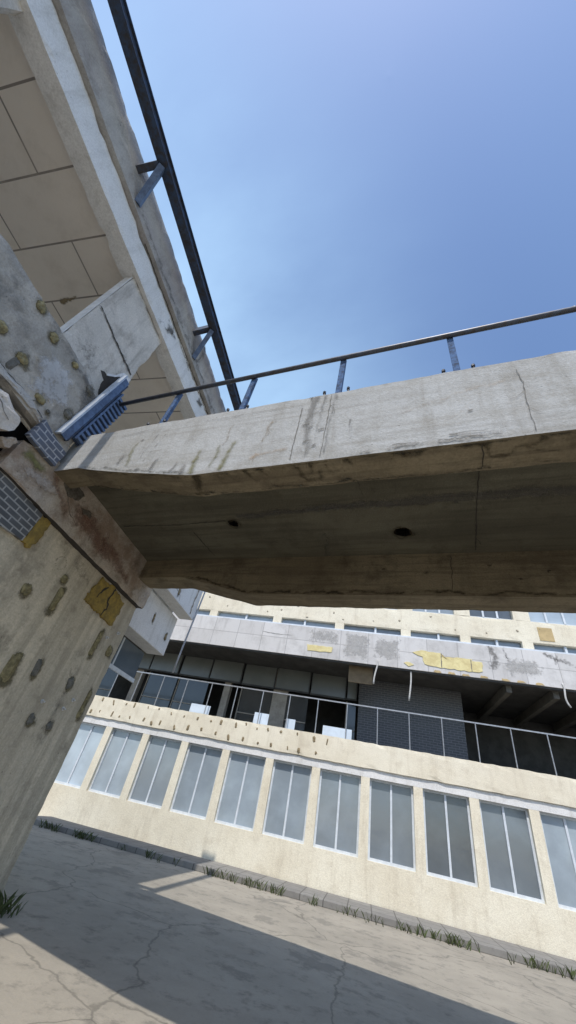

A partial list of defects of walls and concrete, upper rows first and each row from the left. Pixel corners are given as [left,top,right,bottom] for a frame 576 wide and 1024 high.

crack [510,369,541,430]
peeling [313,632,414,666]
peeling [502,660,544,686]